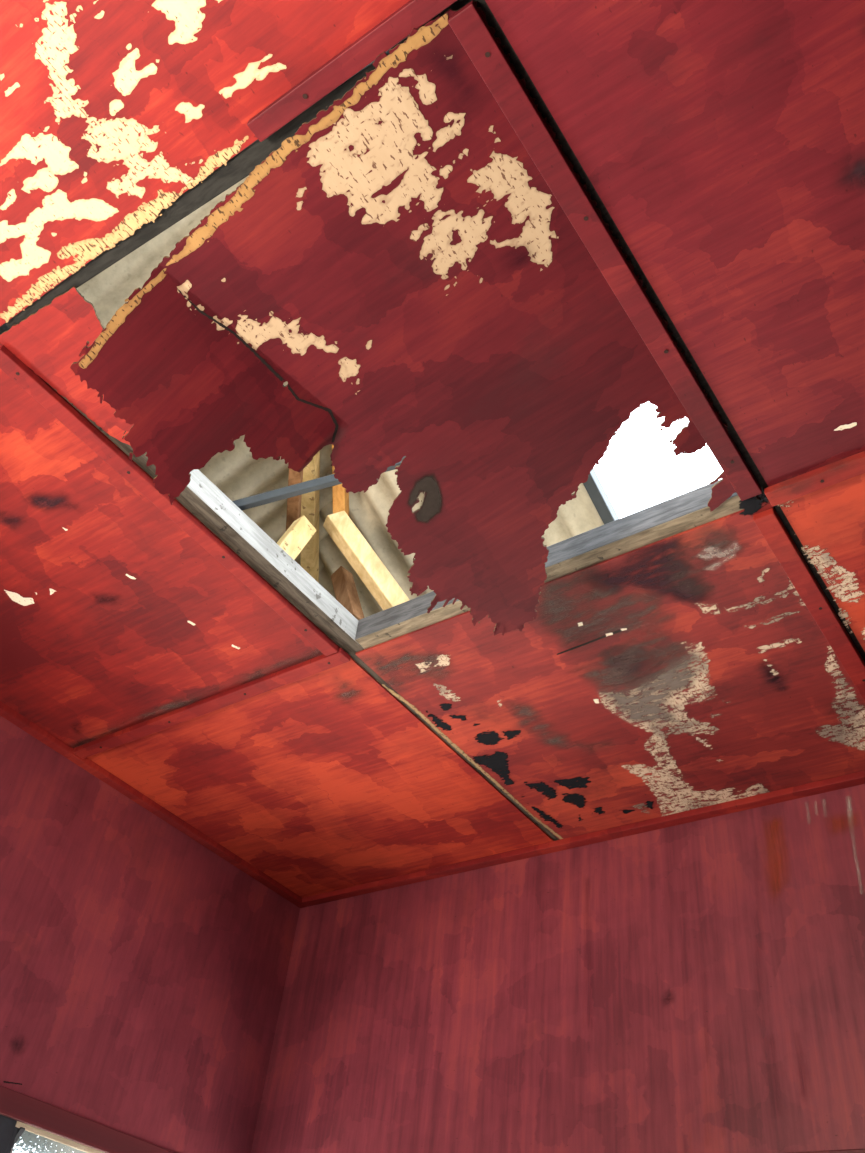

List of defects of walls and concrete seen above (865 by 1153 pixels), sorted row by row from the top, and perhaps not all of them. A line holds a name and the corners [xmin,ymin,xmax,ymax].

peeling [152,0,222,45]
peeling [219,54,287,99]
peeling [0,0,205,282]
peeling [296,187,307,210]
peeling [307,68,559,296]
peeling [177,280,360,395]
peeling [415,654,451,673]
leakage [426,703,605,828]
peeling [593,642,769,817]
peeling [696,580,806,629]
peeling [758,638,802,675]
peeling [815,646,865,750]